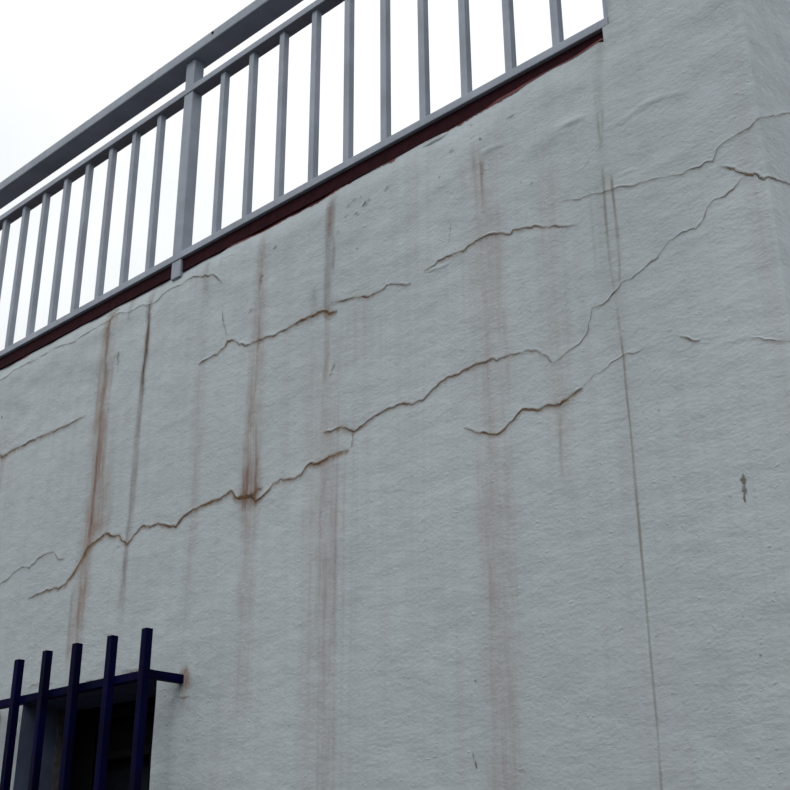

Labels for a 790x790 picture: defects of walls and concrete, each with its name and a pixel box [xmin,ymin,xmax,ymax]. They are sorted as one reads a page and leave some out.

crack [0,110,790,598]